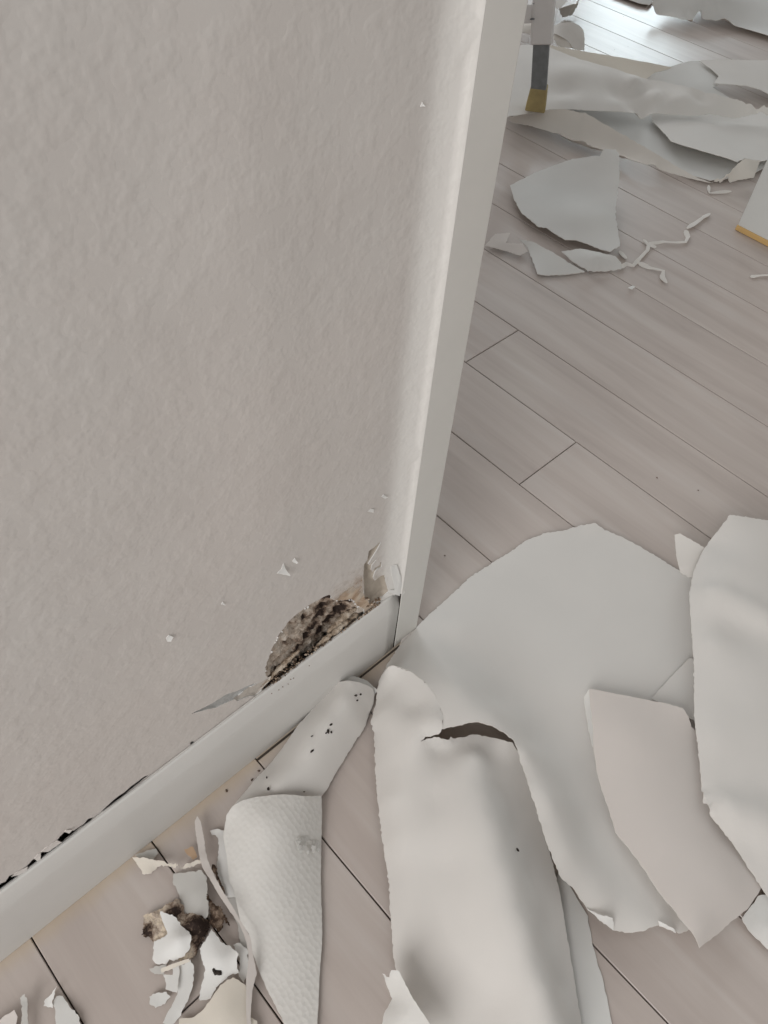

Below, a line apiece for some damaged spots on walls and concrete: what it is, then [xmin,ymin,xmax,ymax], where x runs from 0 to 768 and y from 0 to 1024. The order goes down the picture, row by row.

spalling [234,542,405,700]